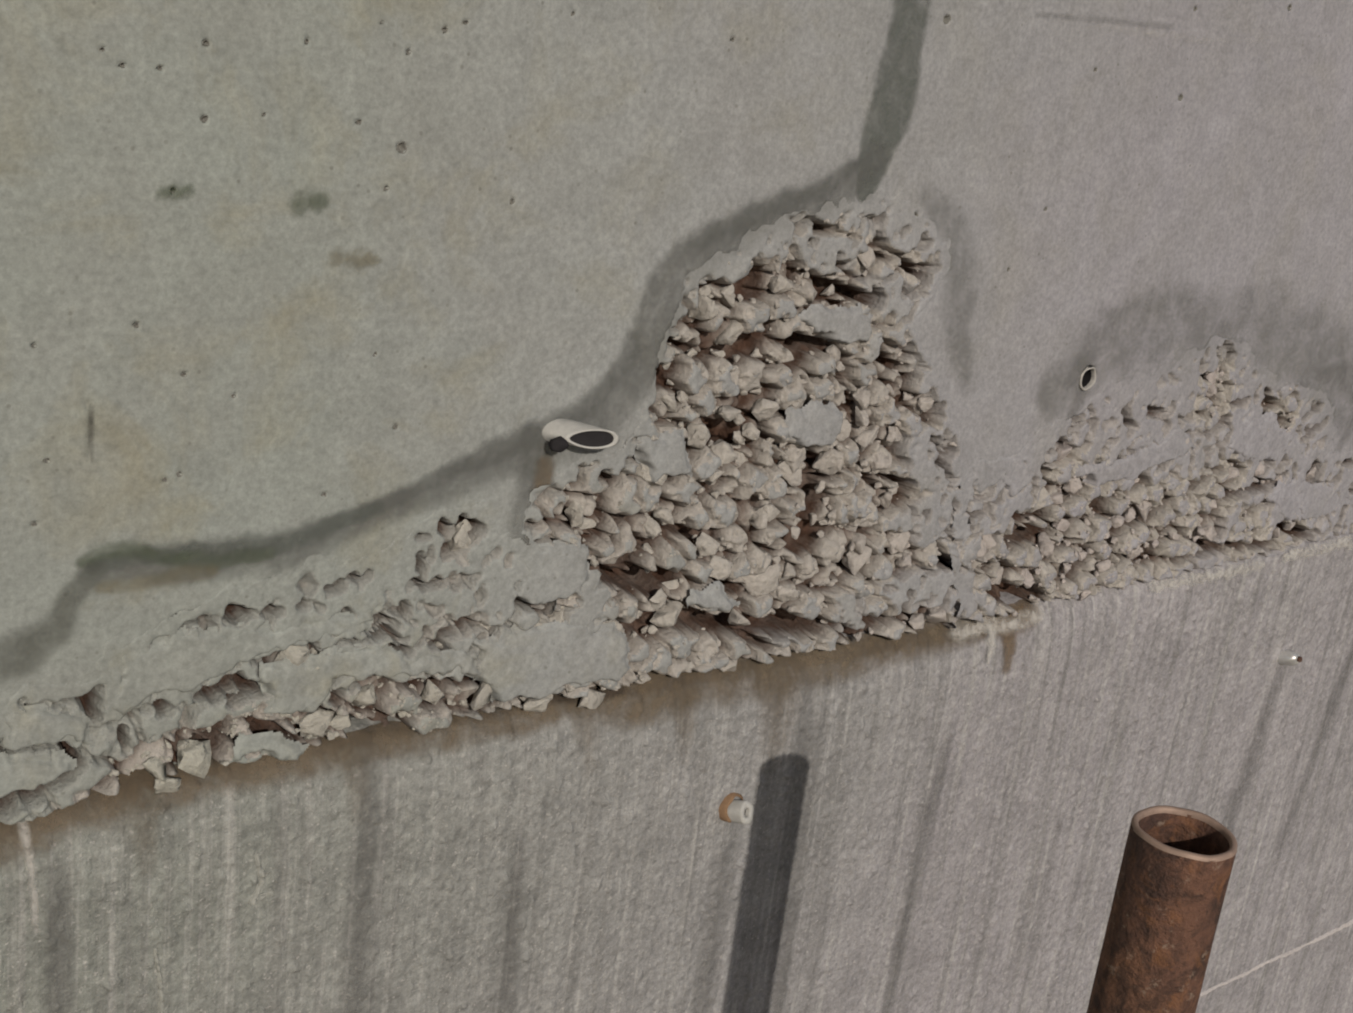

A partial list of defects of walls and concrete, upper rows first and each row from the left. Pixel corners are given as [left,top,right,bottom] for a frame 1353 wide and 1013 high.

leakage [849,0,927,201]
flaking render [687,284,744,345]
flaking render [768,275,838,309]
flaking render [687,398,780,486]
flaking render [777,378,903,509]
leakage [89,490,414,577]
flaking render [696,531,816,602]
flaking render [791,509,911,576]
flaking render [1027,475,1217,601]
flaking render [649,579,683,628]
flaking render [299,684,378,741]
flaking render [141,739,211,793]